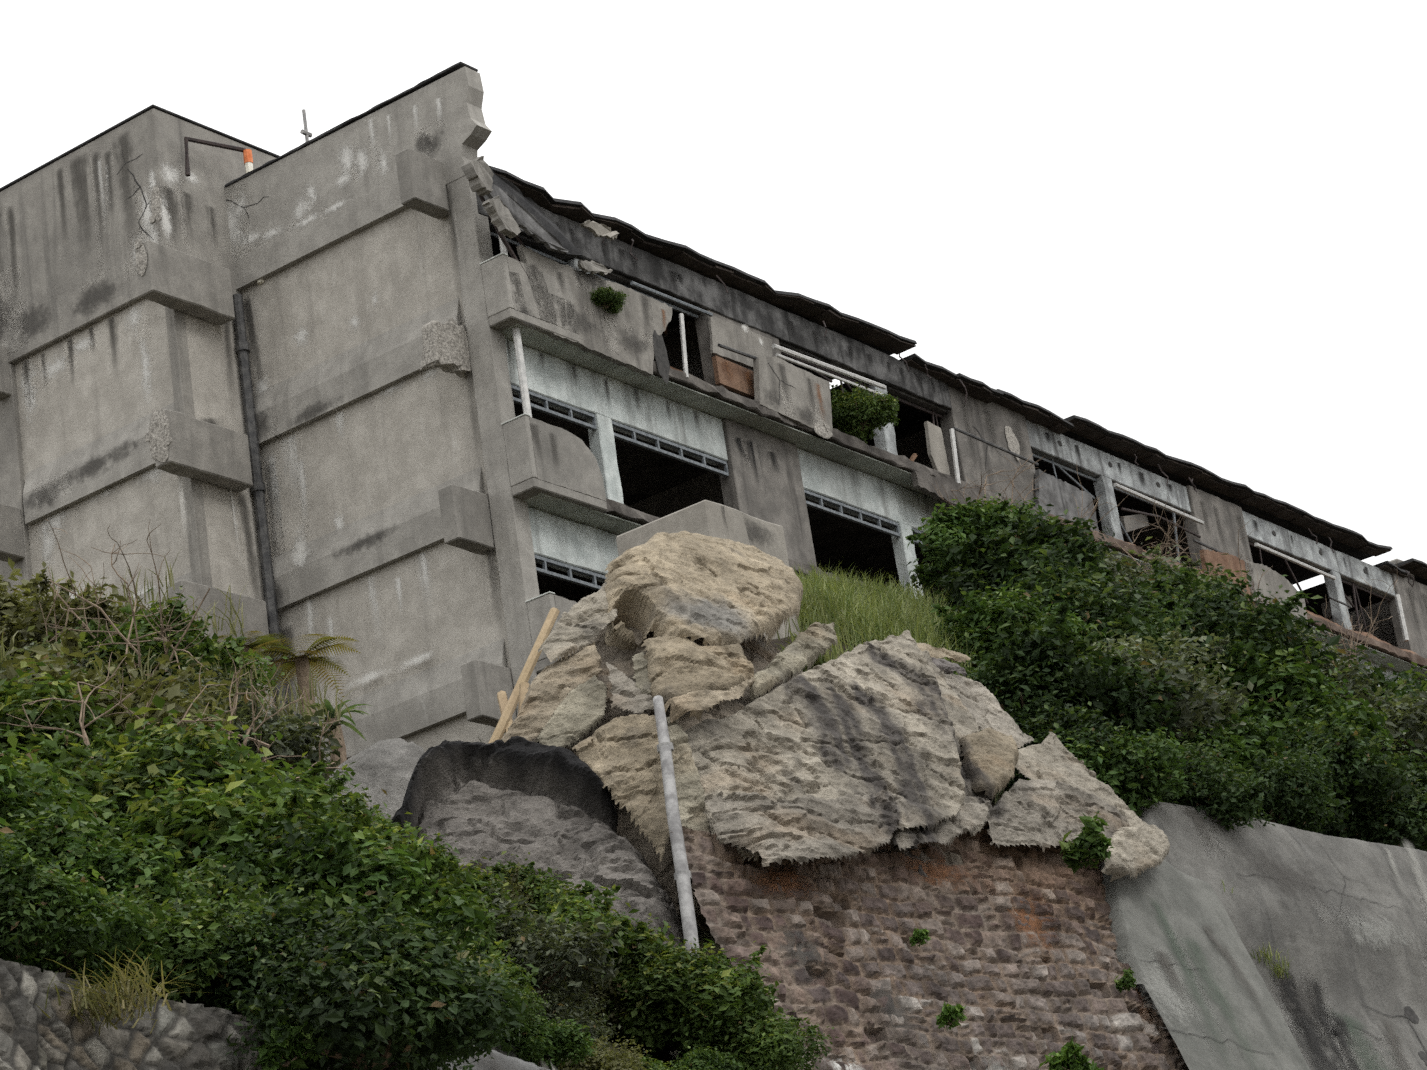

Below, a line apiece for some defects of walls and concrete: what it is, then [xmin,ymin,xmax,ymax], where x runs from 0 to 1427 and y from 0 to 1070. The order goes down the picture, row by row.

leakage [58,137,128,212]
crack [117,153,153,239]
leakage [142,166,198,243]
leakage [210,197,277,244]
leakage [296,186,344,225]
leakage [81,285,113,311]
leakage [109,307,140,347]
leakage [22,328,93,411]
leakage [1282,972,1359,1070]